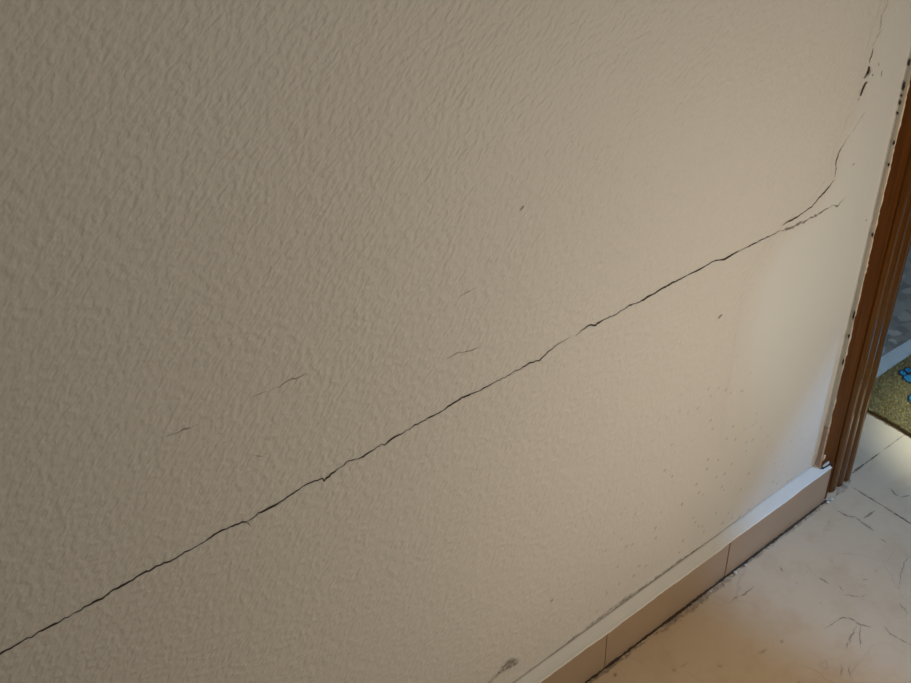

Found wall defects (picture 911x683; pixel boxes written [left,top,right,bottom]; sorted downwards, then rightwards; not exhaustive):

crack [0,143,845,656]